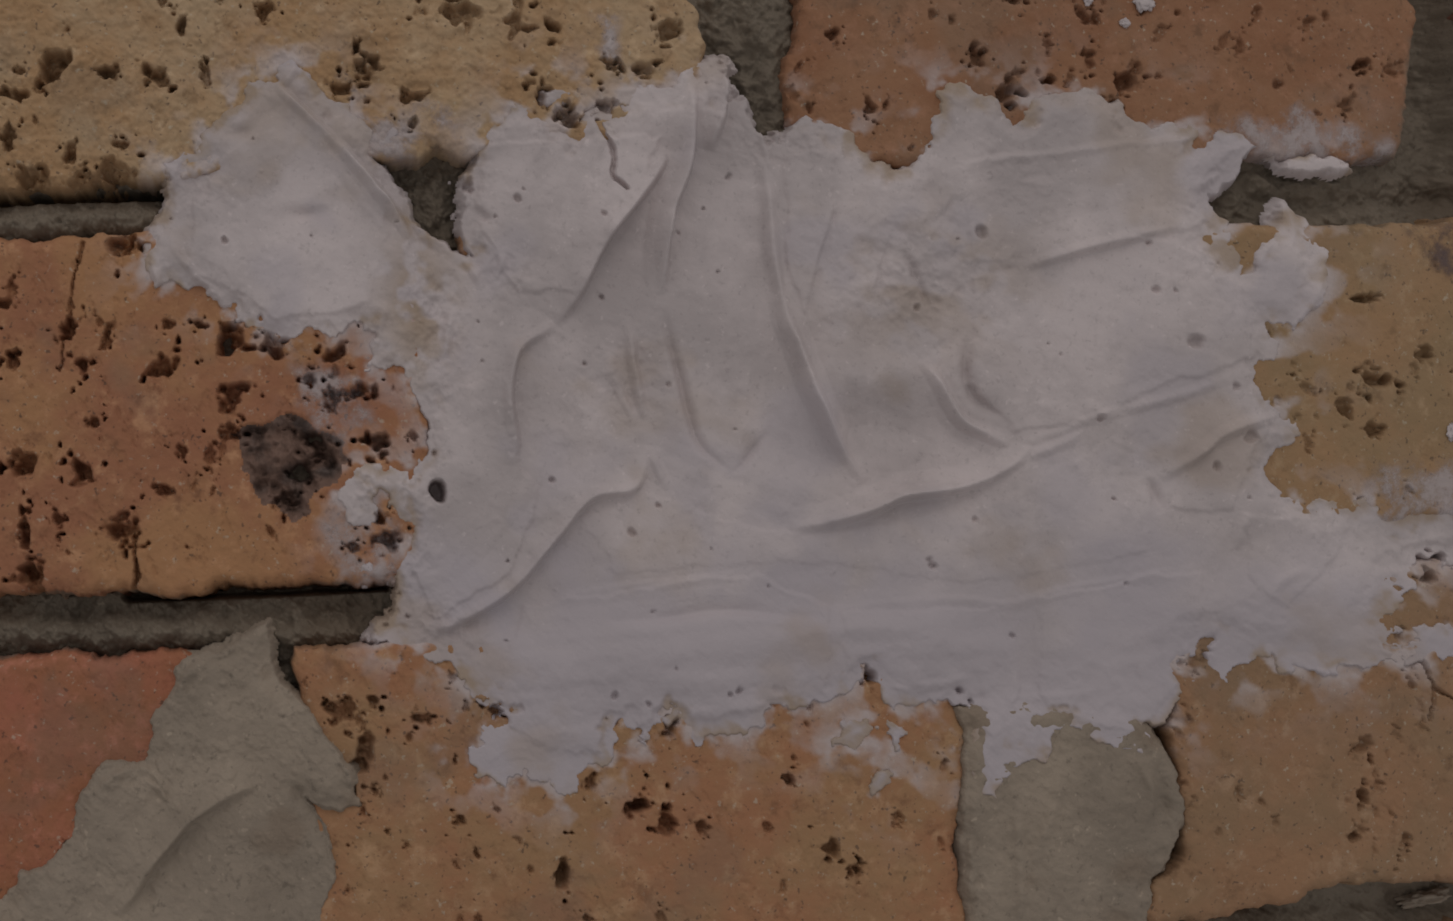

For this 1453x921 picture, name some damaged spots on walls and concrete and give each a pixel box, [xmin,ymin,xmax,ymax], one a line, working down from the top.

peeling [536,89,571,120]
spalling [995,61,1029,112]
spalling [1113,61,1155,97]
peeling [1262,154,1353,182]
spalling [1352,360,1407,405]
spalling [138,321,401,522]
peeling [886,720,908,752]
peeling [868,770,894,796]